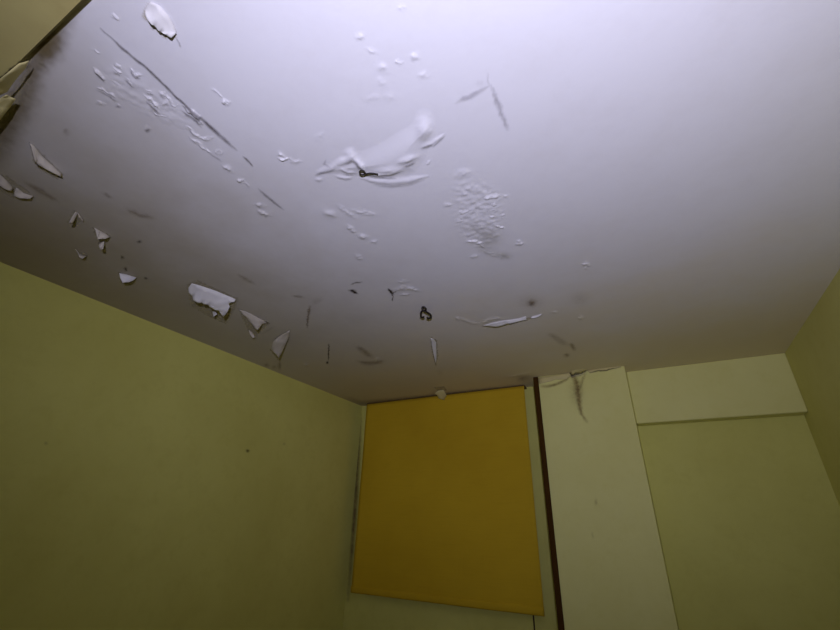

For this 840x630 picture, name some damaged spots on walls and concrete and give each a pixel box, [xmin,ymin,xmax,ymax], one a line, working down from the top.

peeling [145,2,176,38]
peeling [0,60,29,120]
crack [116,42,227,142]
peeling [29,142,62,177]
peeling [0,175,33,199]
peeling [94,228,110,250]
peeling [119,273,136,283]
peeling [188,283,268,338]
peeling [483,314,542,327]